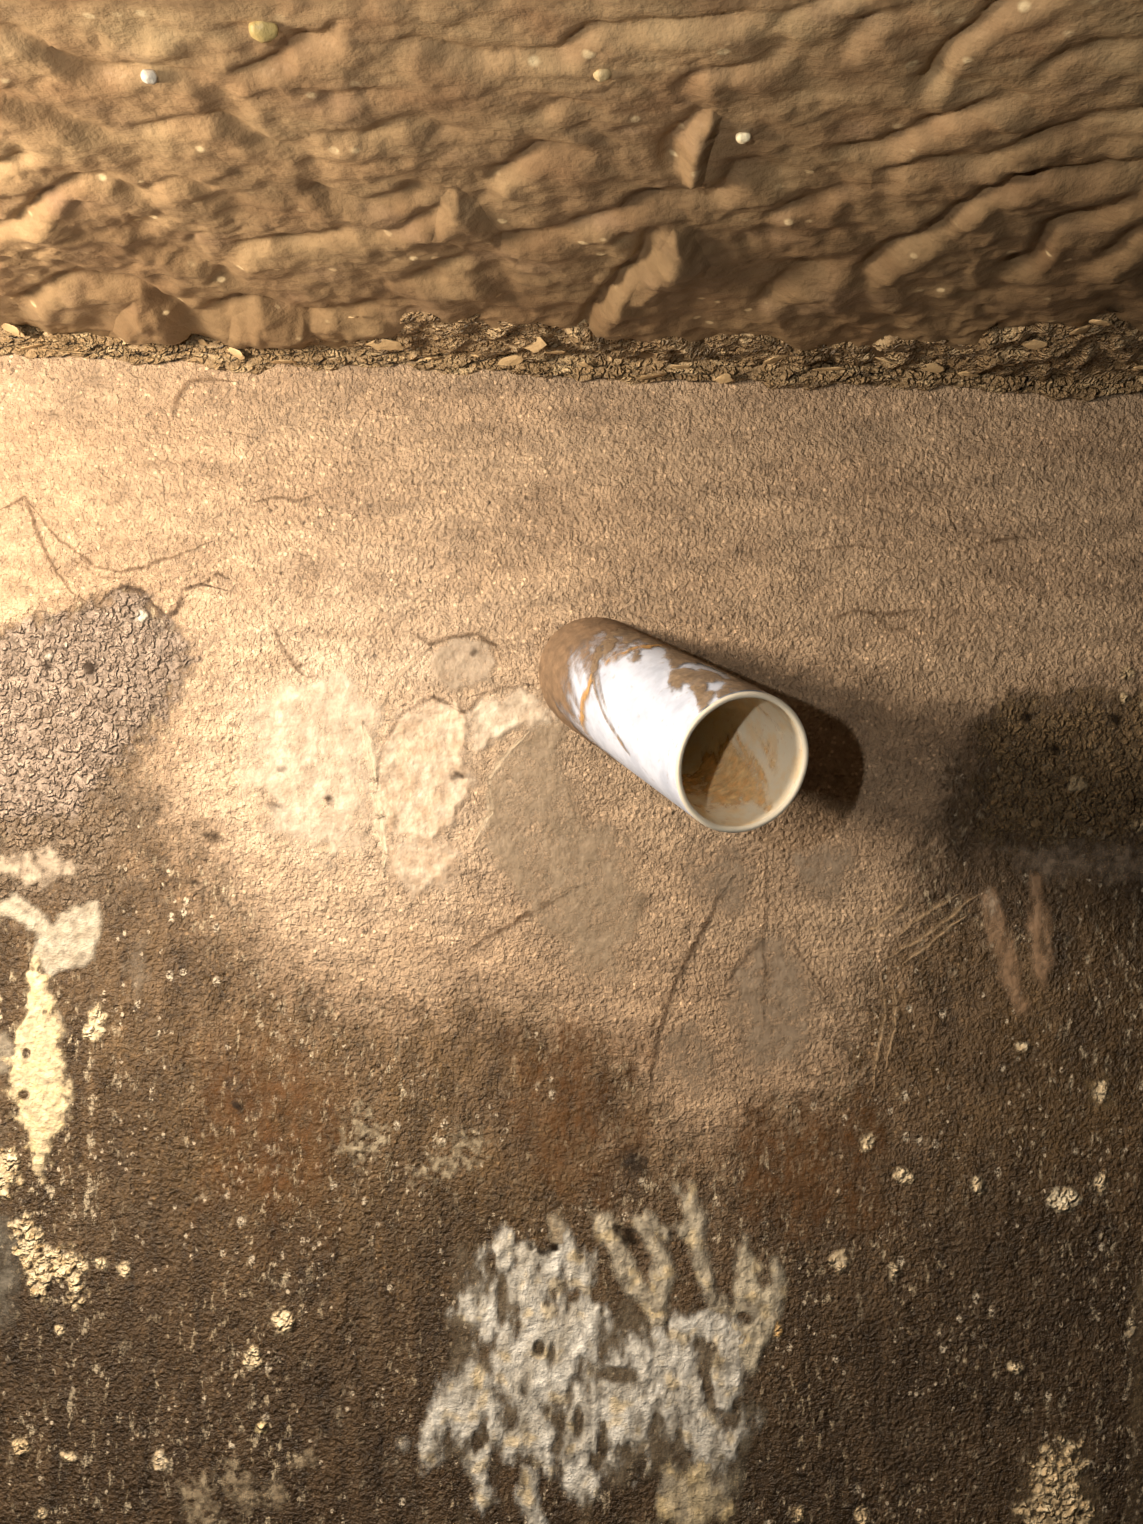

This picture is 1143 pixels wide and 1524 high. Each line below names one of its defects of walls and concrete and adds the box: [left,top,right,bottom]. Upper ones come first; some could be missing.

crack [4,497,228,616]
damp [1015,845,1143,879]
damp [0,846,101,1184]
crack [645,876,733,1112]
damp [337,1103,387,1160]
damp [418,1130,481,1178]
damp [401,1185,785,1524]
damp [182,1472,225,1524]
damp [226,1463,282,1503]